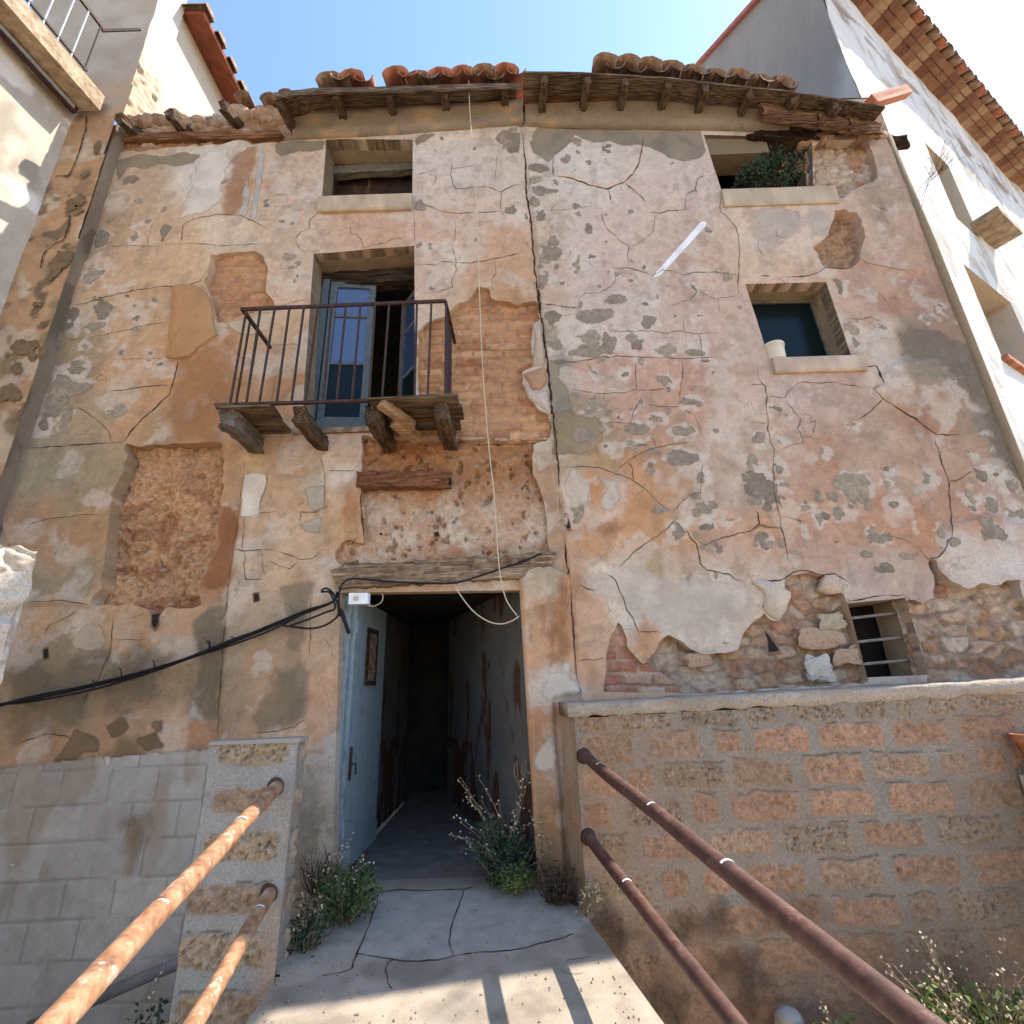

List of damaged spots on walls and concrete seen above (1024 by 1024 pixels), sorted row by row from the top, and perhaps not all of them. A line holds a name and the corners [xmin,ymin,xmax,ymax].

crack [55,116,87,177]
spalling [209,254,274,335]
crack [35,358,178,448]
spalling [336,285,723,565]
crack [350,130,970,691]
spalling [104,447,224,631]
leakage [193,608,224,713]
leakage [255,669,306,727]
crack [217,456,365,731]
leakage [282,583,312,648]
spalling [594,570,861,694]
spalling [891,583,1024,682]